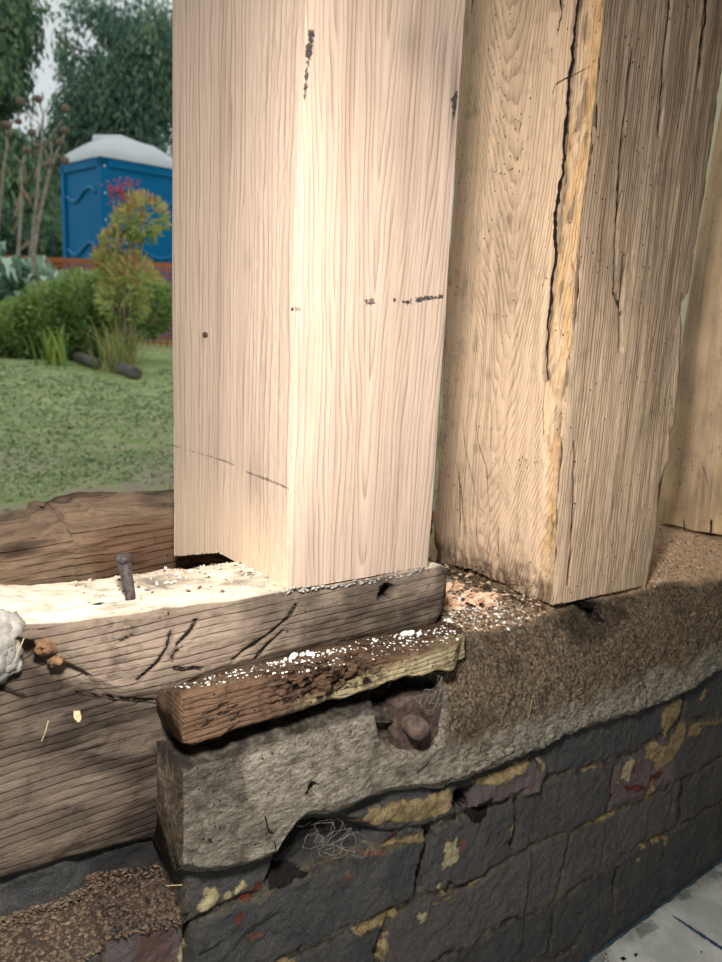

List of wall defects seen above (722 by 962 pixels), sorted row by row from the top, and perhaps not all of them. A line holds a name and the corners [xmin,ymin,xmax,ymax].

crack [543,0,590,434]
crack [612,51,632,334]
peeling [616,688,709,800]
peeling [196,880,248,913]
peeling [351,908,398,937]
peeling [417,836,459,924]